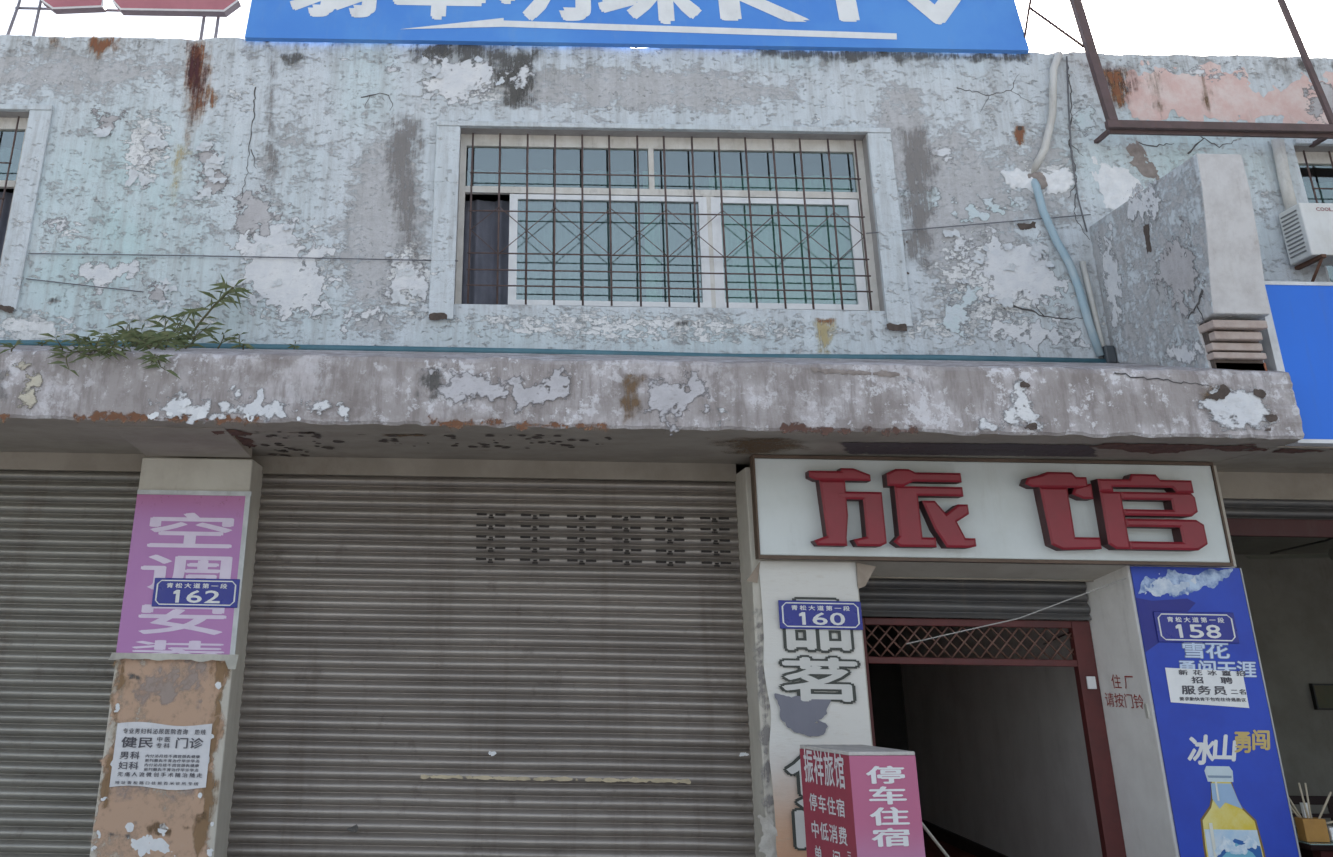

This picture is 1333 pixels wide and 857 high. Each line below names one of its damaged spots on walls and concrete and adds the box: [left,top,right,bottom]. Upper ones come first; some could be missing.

rust [89,36,120,57]
rust [184,43,214,117]
leakage [409,44,539,108]
rust [1103,68,1136,107]
leakage [386,118,424,255]
peeling [188,141,447,340]
peeling [900,167,1091,357]
spalling [1089,140,1333,454]
peeling [73,385,350,457]
peeling [378,356,611,449]
spalling [978,378,1044,432]
peeling [91,659,229,857]